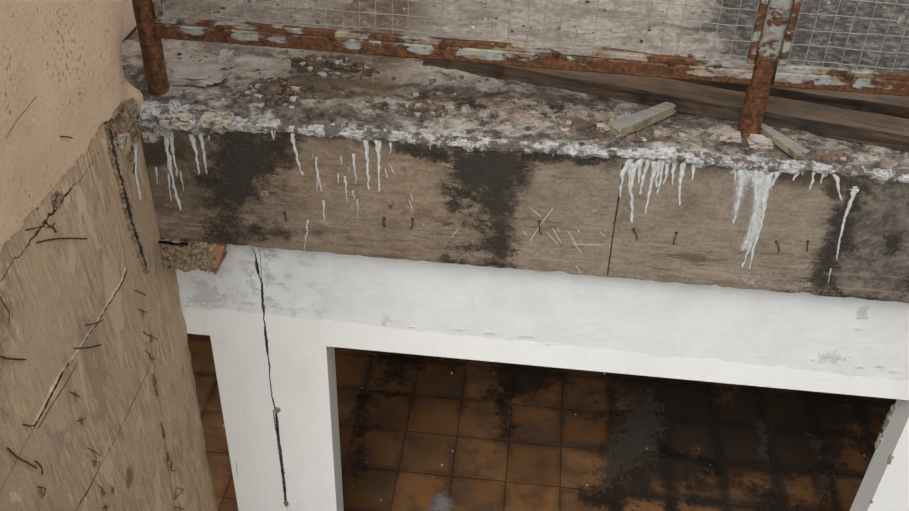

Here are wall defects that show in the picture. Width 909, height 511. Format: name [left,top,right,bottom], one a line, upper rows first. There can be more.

crack [0,118,149,491]
spalling [108,98,143,167]
crack [79,323,175,511]
spalling [158,239,227,275]
crack [252,246,289,508]
leakage [134,100,909,301]
leakage [579,385,725,511]